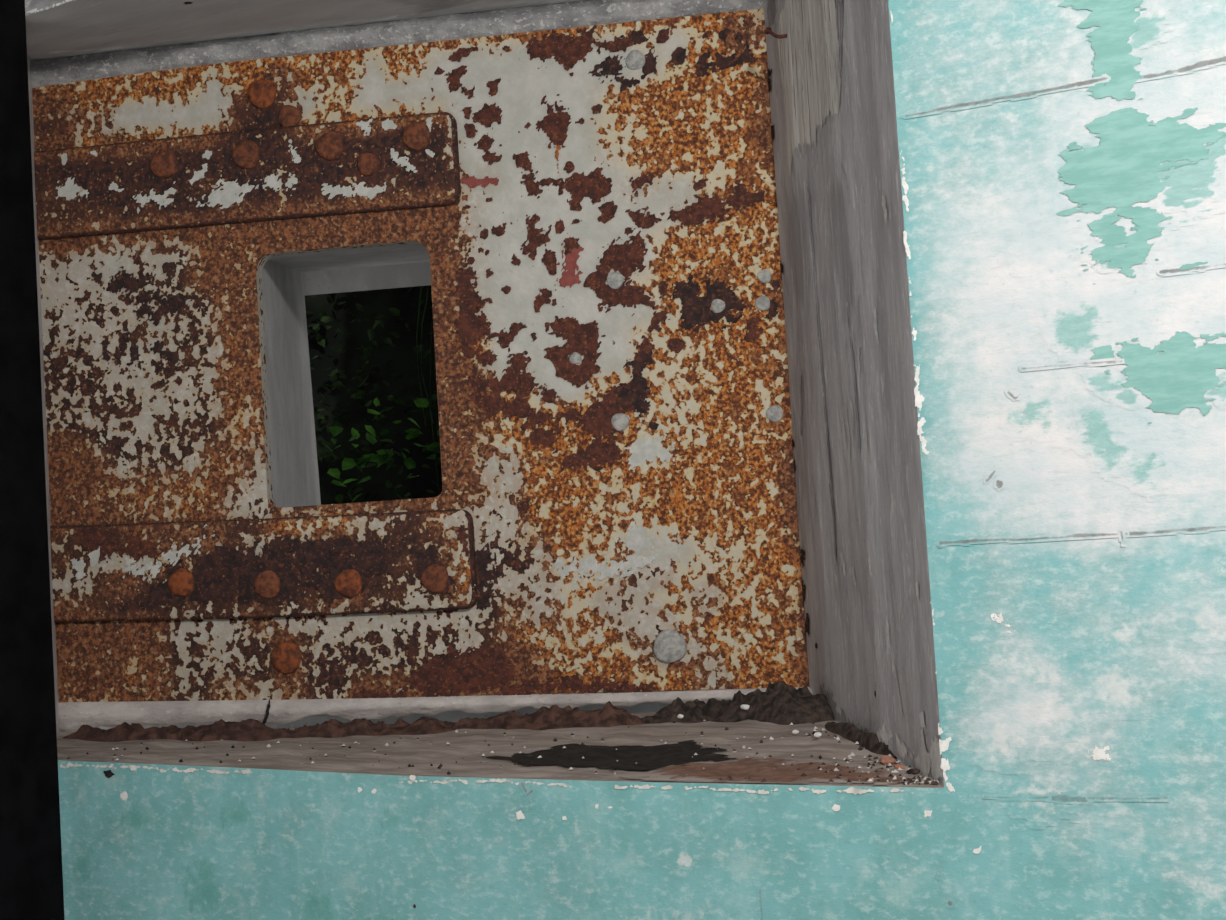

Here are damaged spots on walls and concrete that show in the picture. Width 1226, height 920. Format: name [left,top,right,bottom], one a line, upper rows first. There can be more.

corrosion [526,25,756,98]
crack [902,53,1226,119]
peeling [1056,0,1226,284]
spalling [900,150,909,212]
corrosion [434,46,781,475]
spalling [903,231,911,259]
corrosion [93,261,194,380]
peeling [1079,331,1226,424]
corrosion [517,497,533,517]
spalling [983,468,1005,491]
corrosion [79,525,497,615]
corrosion [350,645,655,699]